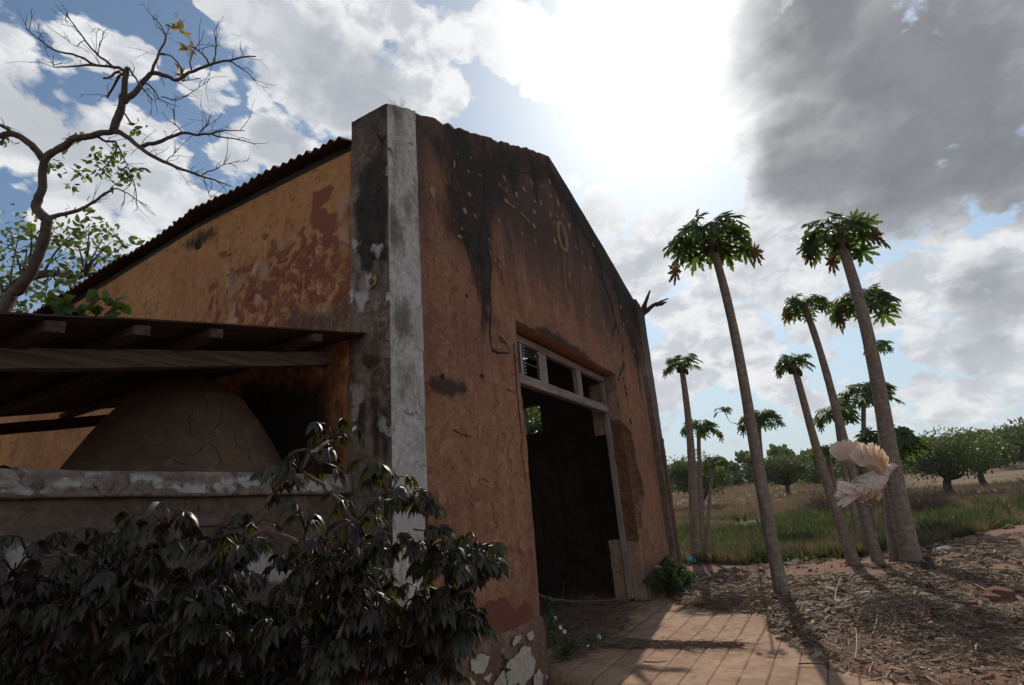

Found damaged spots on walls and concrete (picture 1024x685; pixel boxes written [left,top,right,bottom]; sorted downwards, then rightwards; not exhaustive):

peeling [208,185,377,329]
water stain [354,136,396,274]
water stain [440,125,641,390]
peeling [350,385,363,422]
water stain [358,396,387,458]
crack [478,187,527,484]
spalling [610,420,645,541]
peeling [470,597,544,685]